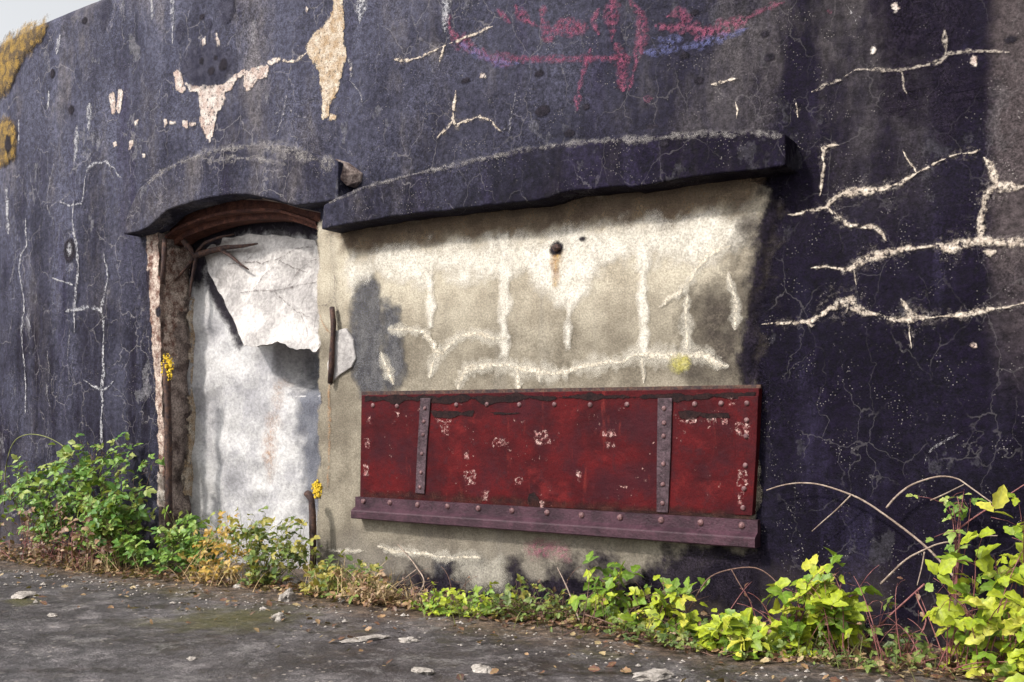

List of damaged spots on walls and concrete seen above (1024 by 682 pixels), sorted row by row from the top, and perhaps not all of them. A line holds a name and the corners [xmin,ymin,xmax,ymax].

peeling [164,57,279,143]
peeling [305,0,352,120]
crack [394,26,493,62]
crack [439,90,510,135]
crack [47,148,119,444]
water stain [337,177,776,392]
crack [771,144,1024,346]
corrosion [364,392,756,405]
corrosion [364,492,748,518]